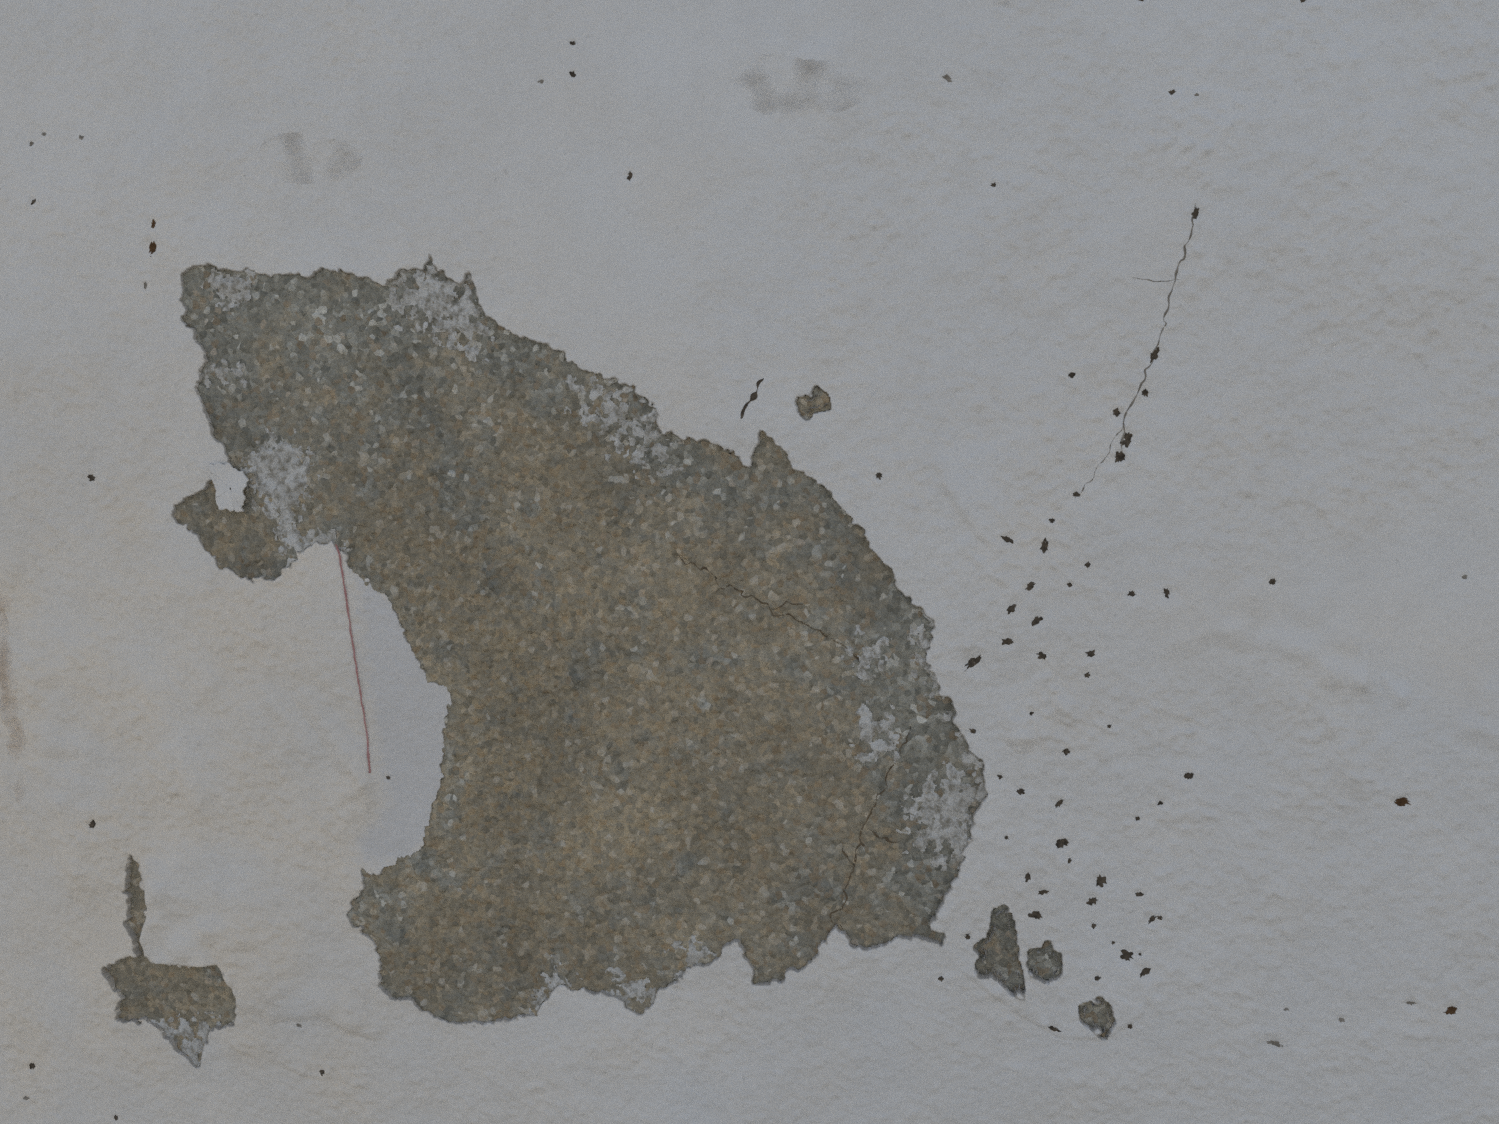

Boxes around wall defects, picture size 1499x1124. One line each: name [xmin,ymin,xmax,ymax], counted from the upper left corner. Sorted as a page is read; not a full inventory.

crack [1075,203,1199,498]
peeling [174,258,988,1023]
peeling [105,832,339,1067]
peeling [974,905,1062,992]
peeling [1079,997,1115,1037]